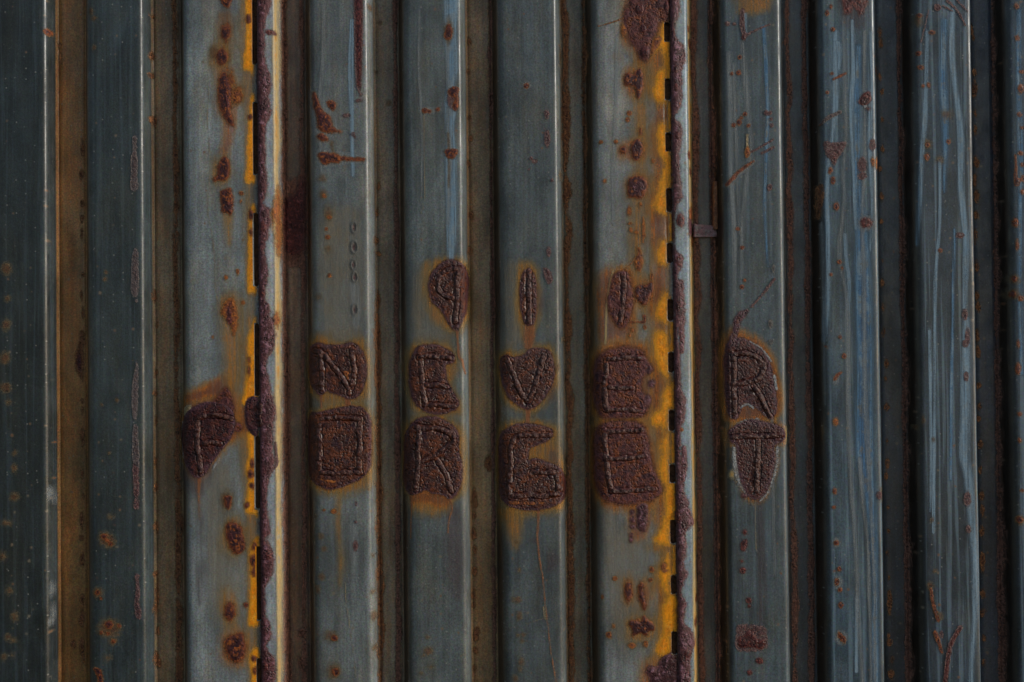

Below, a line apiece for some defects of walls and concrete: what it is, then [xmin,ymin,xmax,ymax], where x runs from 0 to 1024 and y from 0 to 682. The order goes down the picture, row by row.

rust [171,0,308,682]
rust [307,0,478,682]
rust [473,0,846,682]